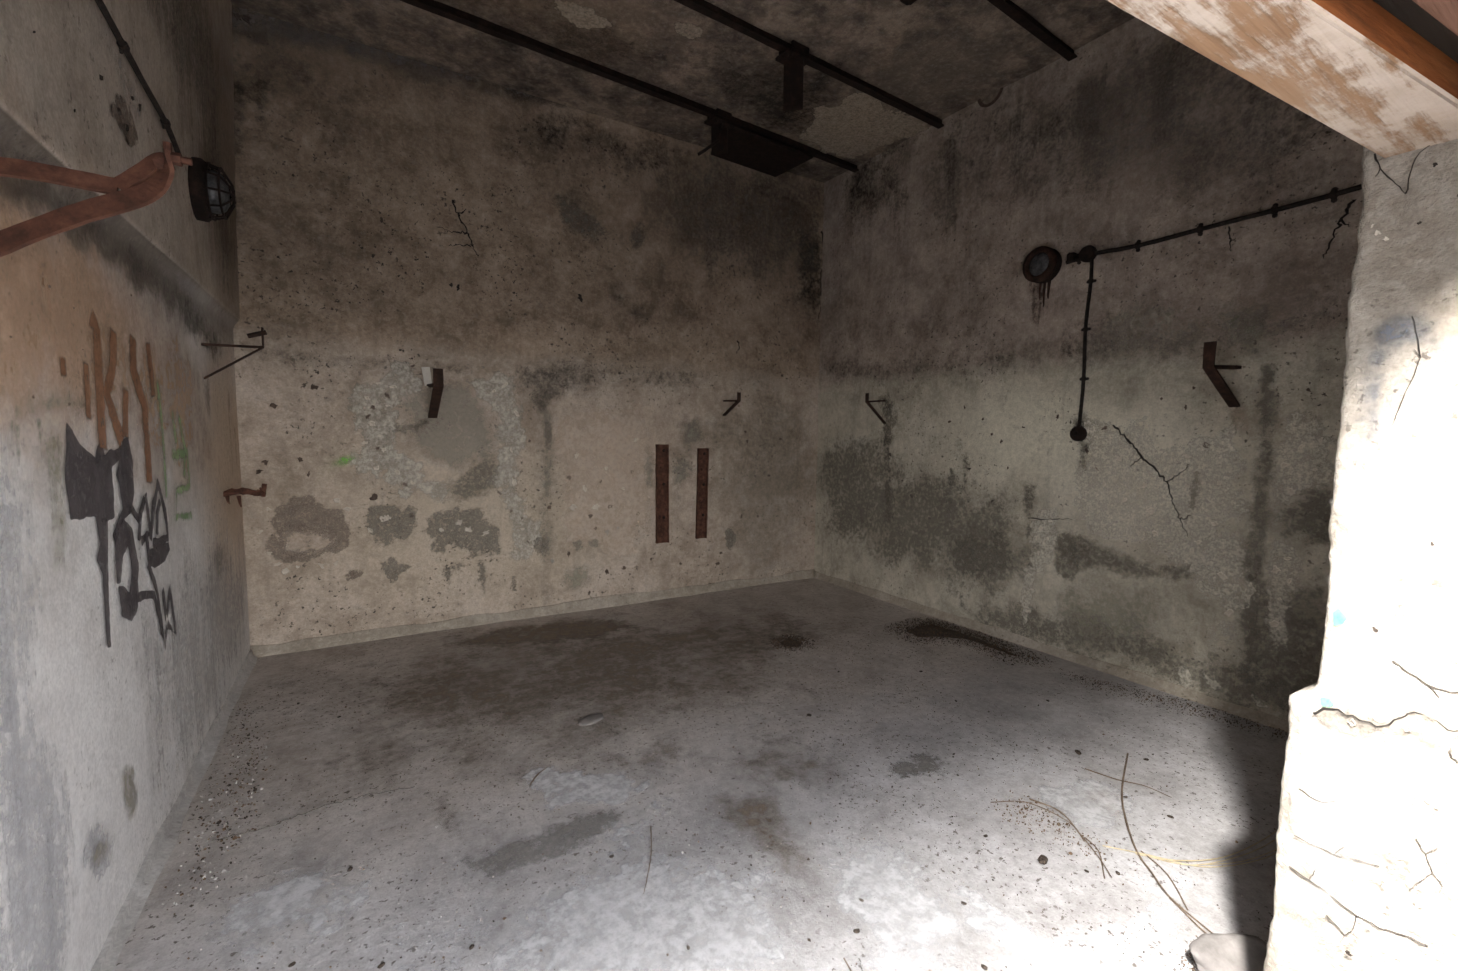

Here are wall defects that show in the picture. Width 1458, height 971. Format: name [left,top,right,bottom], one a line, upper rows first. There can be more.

peeling [257,361,619,585]
damp [821,366,1333,710]
crack [1113,424,1191,538]
crack [1392,660,1458,697]
crack [1289,835,1428,946]
crack [1408,838,1443,896]